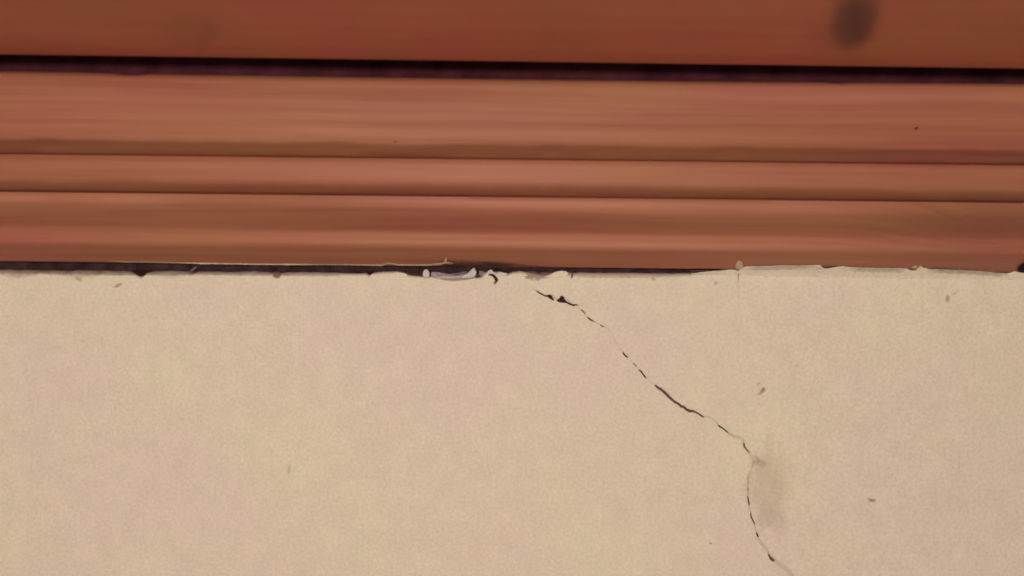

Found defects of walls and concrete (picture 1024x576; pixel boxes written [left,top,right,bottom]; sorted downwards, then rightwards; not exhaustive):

flaking render [395,268,528,283]
crack [537,291,593,321]
crack [623,352,748,451]